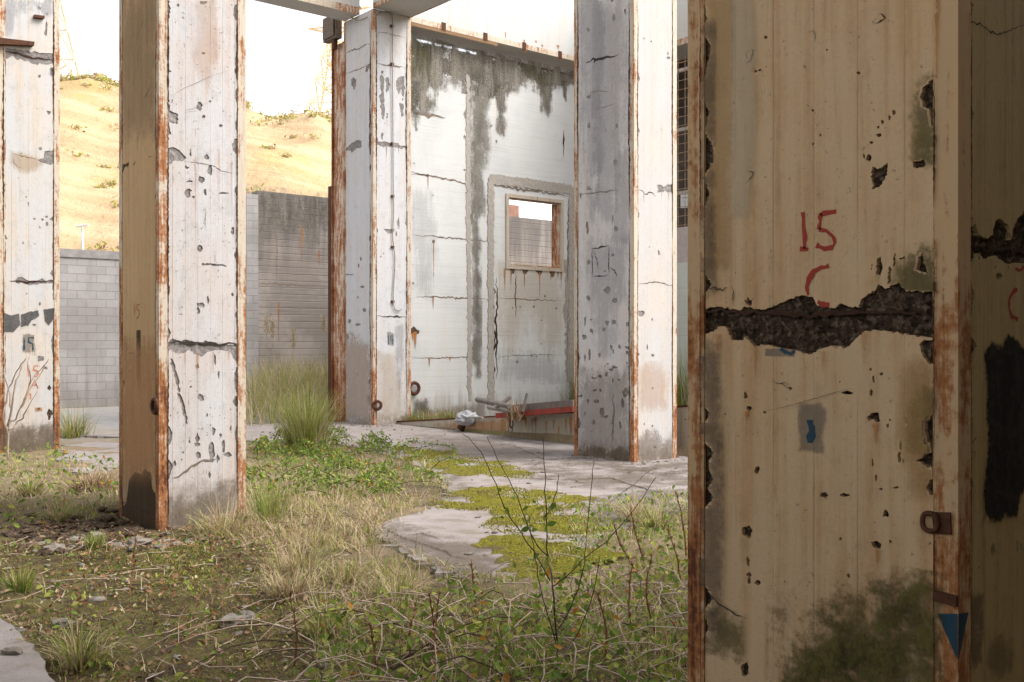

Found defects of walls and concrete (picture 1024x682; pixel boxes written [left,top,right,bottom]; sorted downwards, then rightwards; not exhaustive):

spalling [923,82,933,113]
crack [133,9,328,521]
leakage [411,33,574,377]
crack [346,0,673,514]
spalling [706,259,933,364]
spalling [869,156,888,187]
spalling [971,212,1024,264]
spalling [168,328,237,424]
peeling [168,414,237,479]
leakage [122,469,156,529]